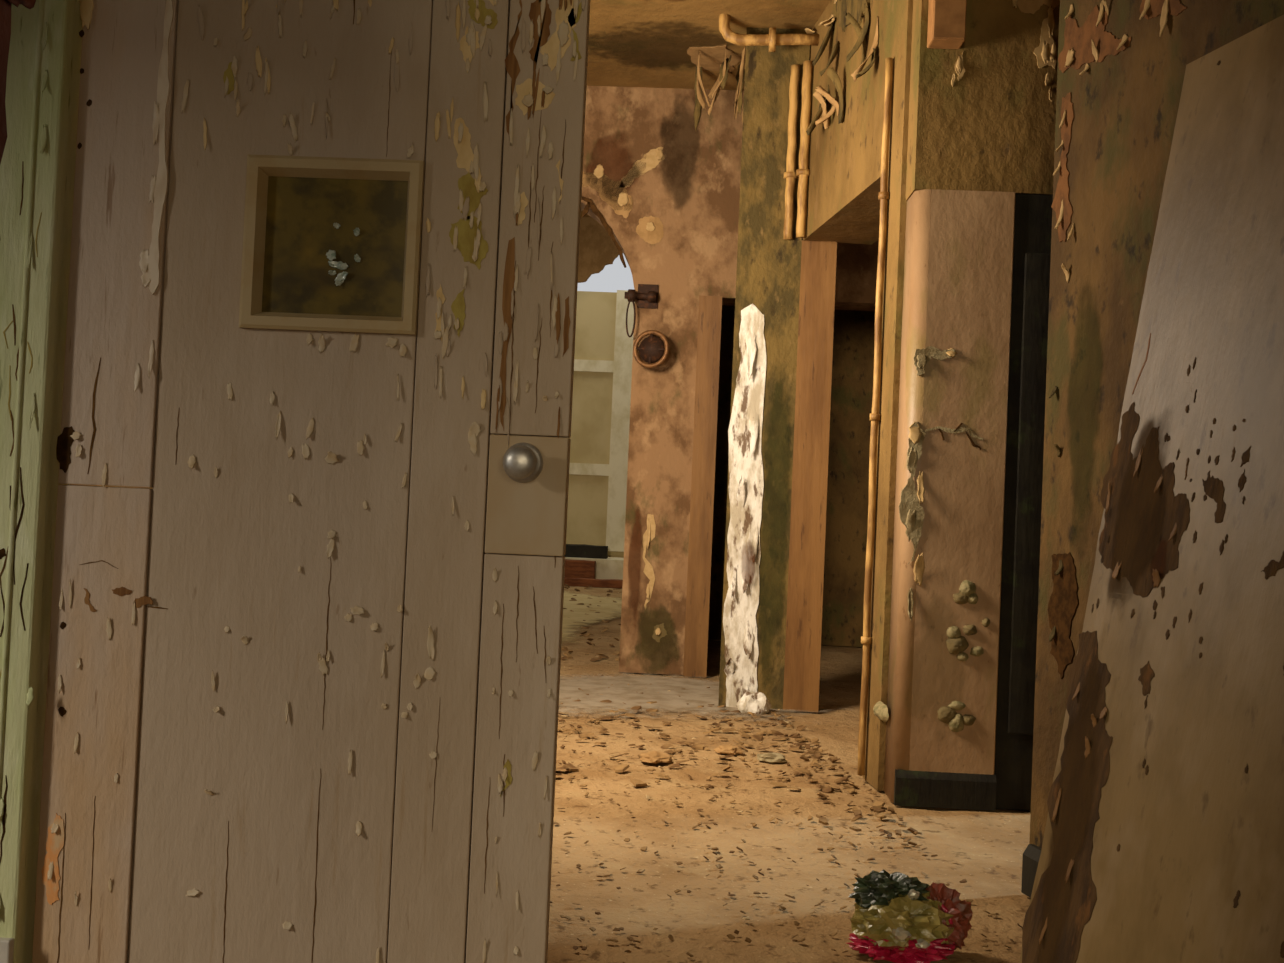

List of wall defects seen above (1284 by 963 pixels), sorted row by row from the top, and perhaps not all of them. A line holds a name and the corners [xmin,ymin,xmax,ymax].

peeling [1139,0,1187,37]
peeling [139,0,174,295]
peeling [1012,0,1132,242]
peeling [326,250,361,286]
peeling [434,118,488,341]
peeling [468,0,586,456]
peeling [56,426,83,473]
peeling [723,304,766,710]
peeling [59,581,113,640]
peeling [111,587,153,625]
peeling [1048,552,1079,679]
peeling [42,813,78,906]